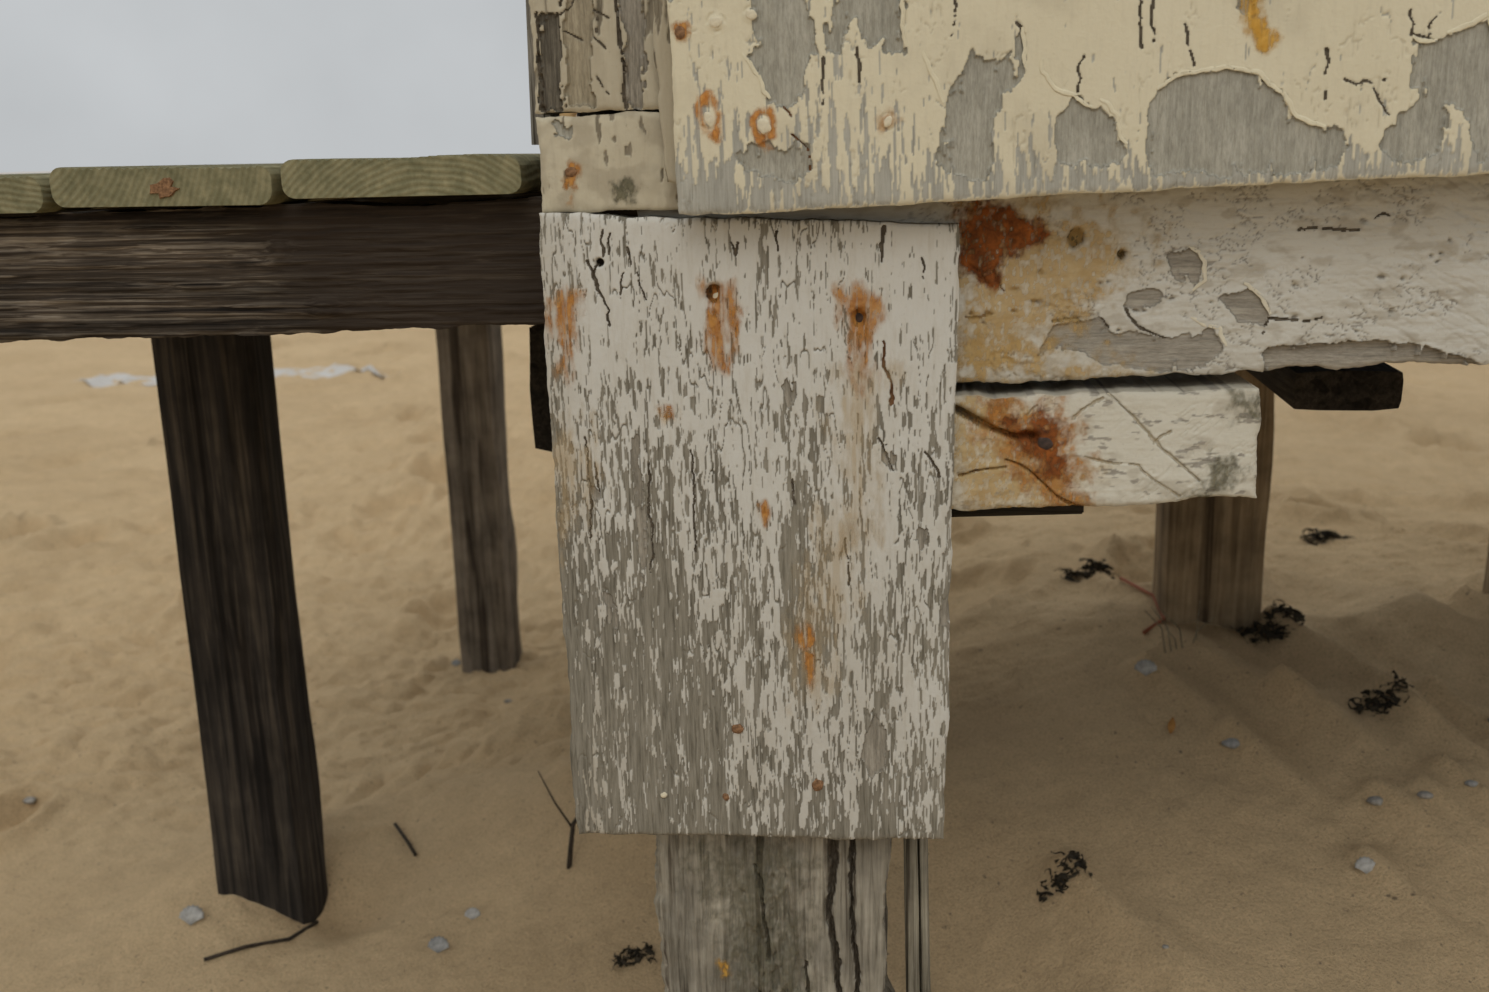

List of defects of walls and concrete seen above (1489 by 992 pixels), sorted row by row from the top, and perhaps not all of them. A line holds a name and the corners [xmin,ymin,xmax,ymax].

rust [695,90,720,141]
rust [750,107,775,147]
peeling [735,0,1128,184]
peeling [1145,65,1349,179]
peeling [1379,12,1489,165]
rust [954,199,1050,290]
rust [701,285,738,373]
rust [833,286,882,367]
peeling [877,438,897,469]
rust [983,398,1088,506]
peeling [916,527,929,550]
crack [753,839,861,992]